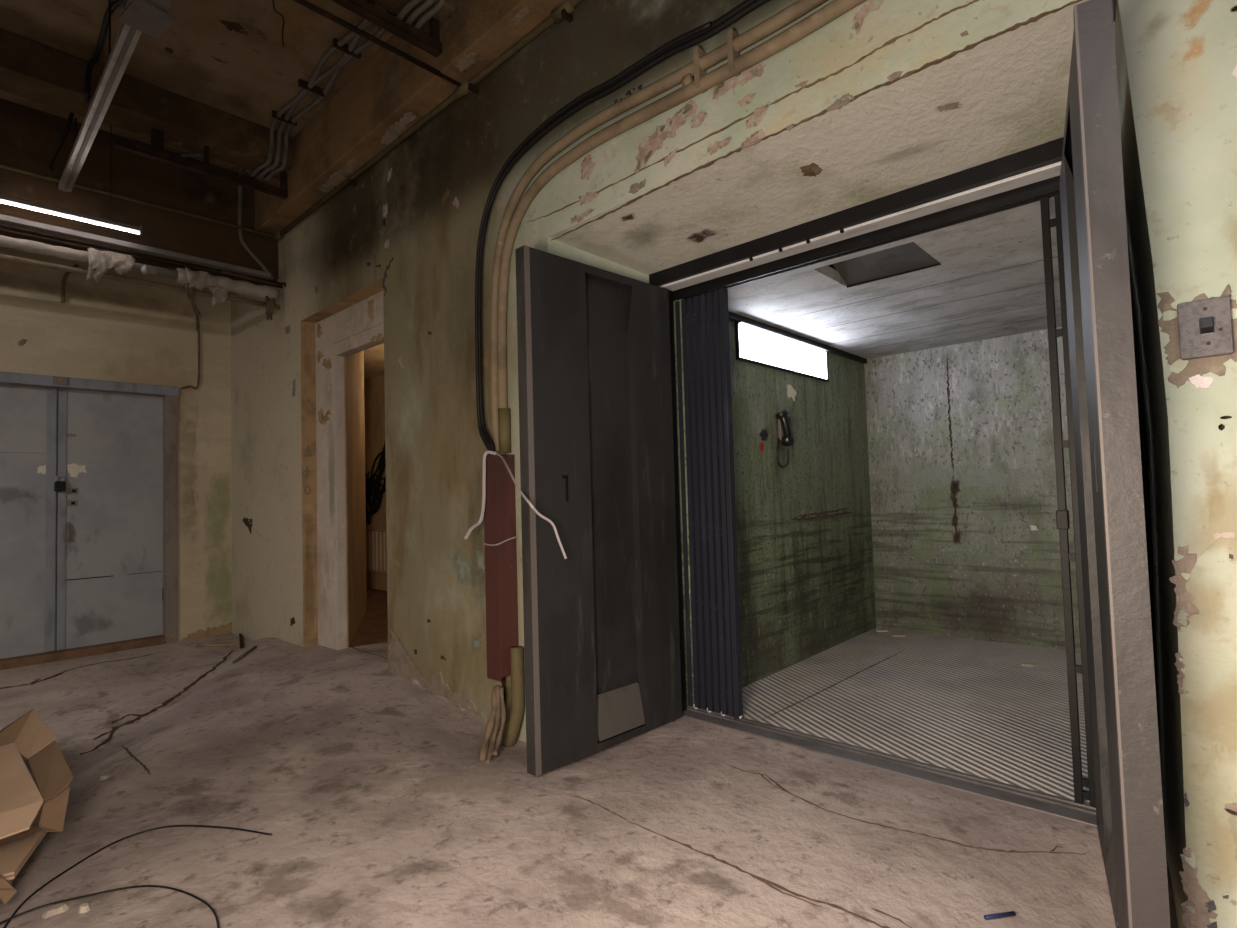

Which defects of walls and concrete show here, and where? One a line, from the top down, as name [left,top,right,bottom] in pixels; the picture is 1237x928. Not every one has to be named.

spalling [551,0,1082,241]
peeling [1156,284,1237,388]
spalling [1169,545,1199,630]
crack [80,650,234,775]
spalling [1174,651,1186,694]
crack [715,759,1087,855]
peeling [1224,803,1237,816]
crack [575,795,912,928]
spalling [1179,848,1229,928]